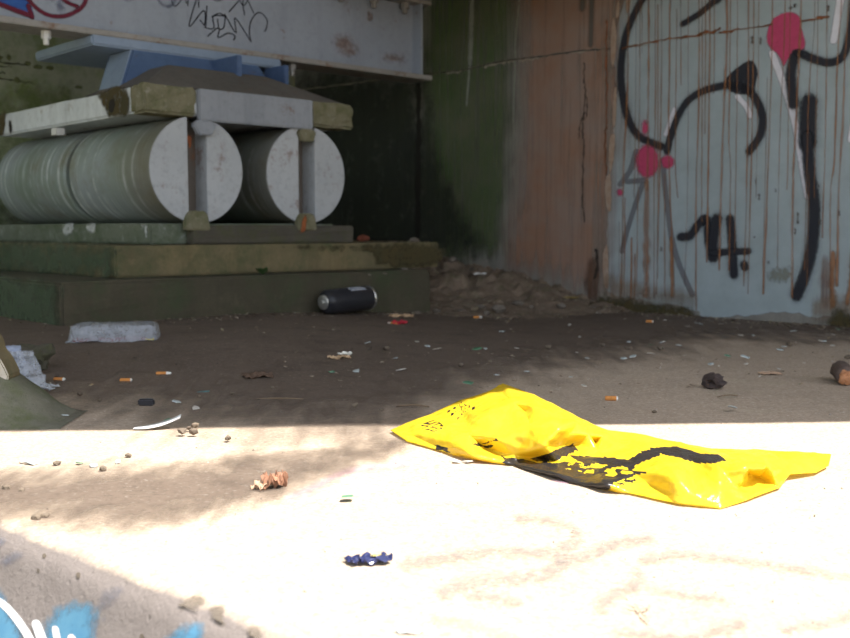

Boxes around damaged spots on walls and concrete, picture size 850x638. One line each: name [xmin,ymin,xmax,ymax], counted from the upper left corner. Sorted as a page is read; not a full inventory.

rust [0,113,12,136]
crack [0,54,54,84]
rust [98,86,130,117]
crack [415,20,772,239]
rust [510,0,715,299]
rust [719,0,801,298]
crack [801,15,830,23]
rust [805,0,850,310]